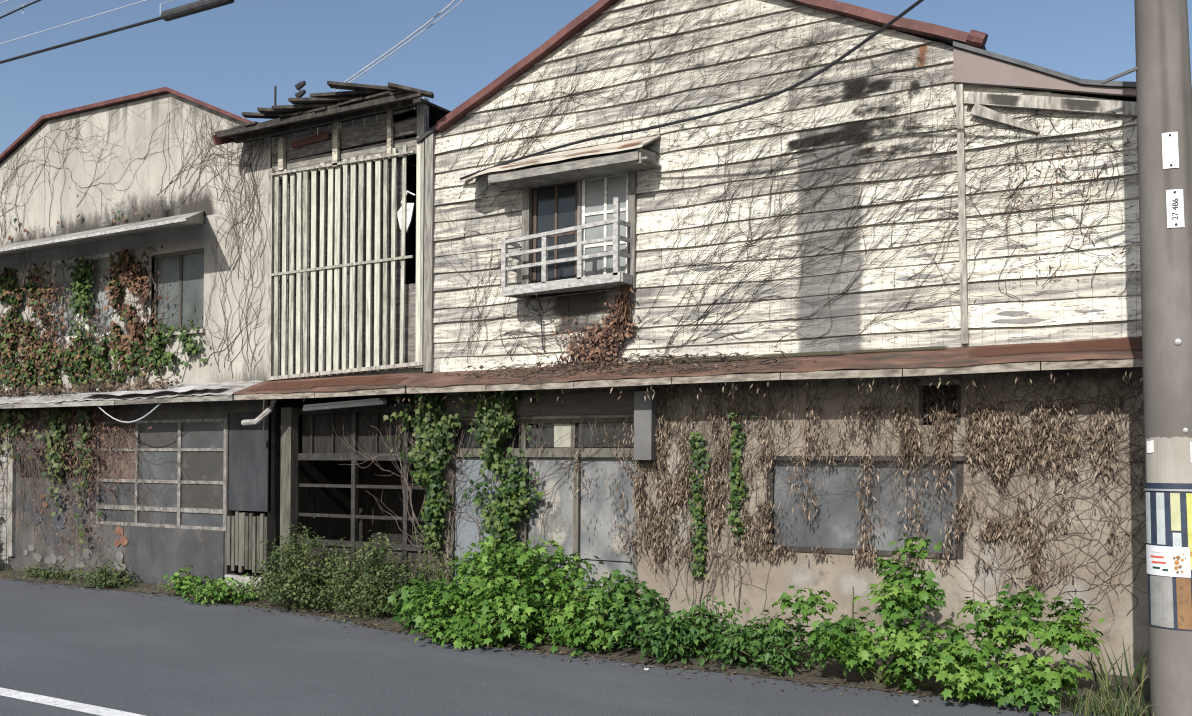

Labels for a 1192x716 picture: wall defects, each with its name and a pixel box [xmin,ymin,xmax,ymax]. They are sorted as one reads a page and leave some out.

leakage [654,77,946,385]
leakage [999,359,1099,377]
rust [250,375,405,391]